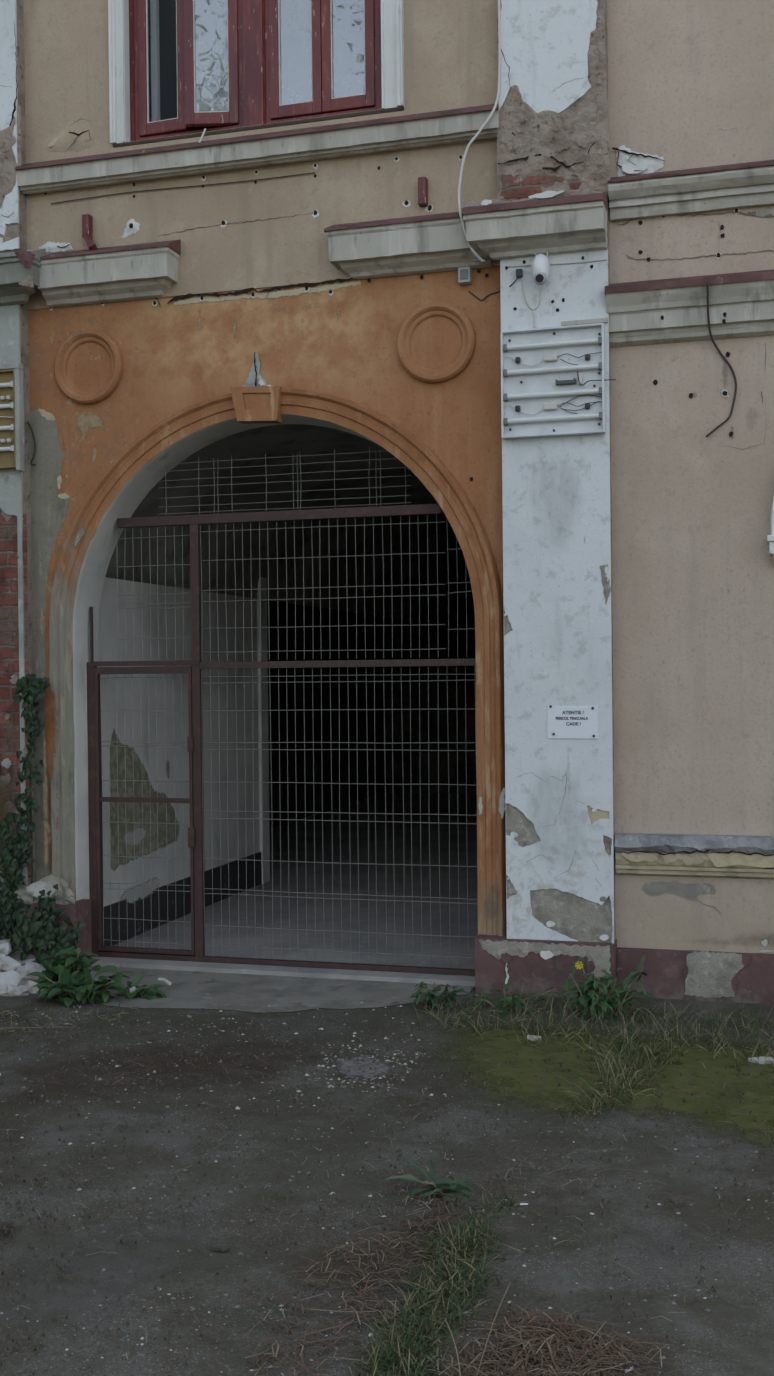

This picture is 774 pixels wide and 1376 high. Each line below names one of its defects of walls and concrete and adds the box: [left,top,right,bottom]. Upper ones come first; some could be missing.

crack [1,25,19,126]
flaking render [0,105,21,207]
flaking render [461,0,664,210]
flaking render [0,225,73,288]
peeling [0,409,85,905]
flaking render [479,875,613,984]
flaking render [683,951,750,998]